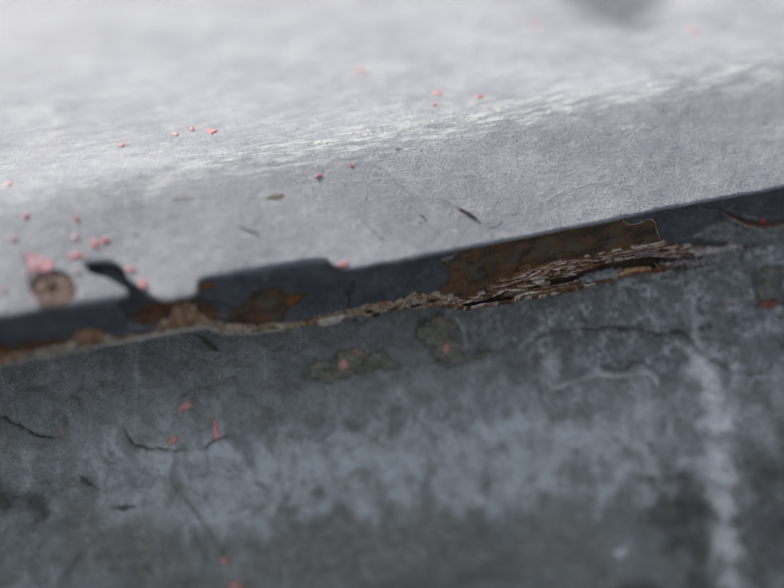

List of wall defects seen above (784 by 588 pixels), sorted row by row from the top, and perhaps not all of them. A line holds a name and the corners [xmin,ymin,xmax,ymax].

rust [0,219,706,366]
crack [536,324,728,369]